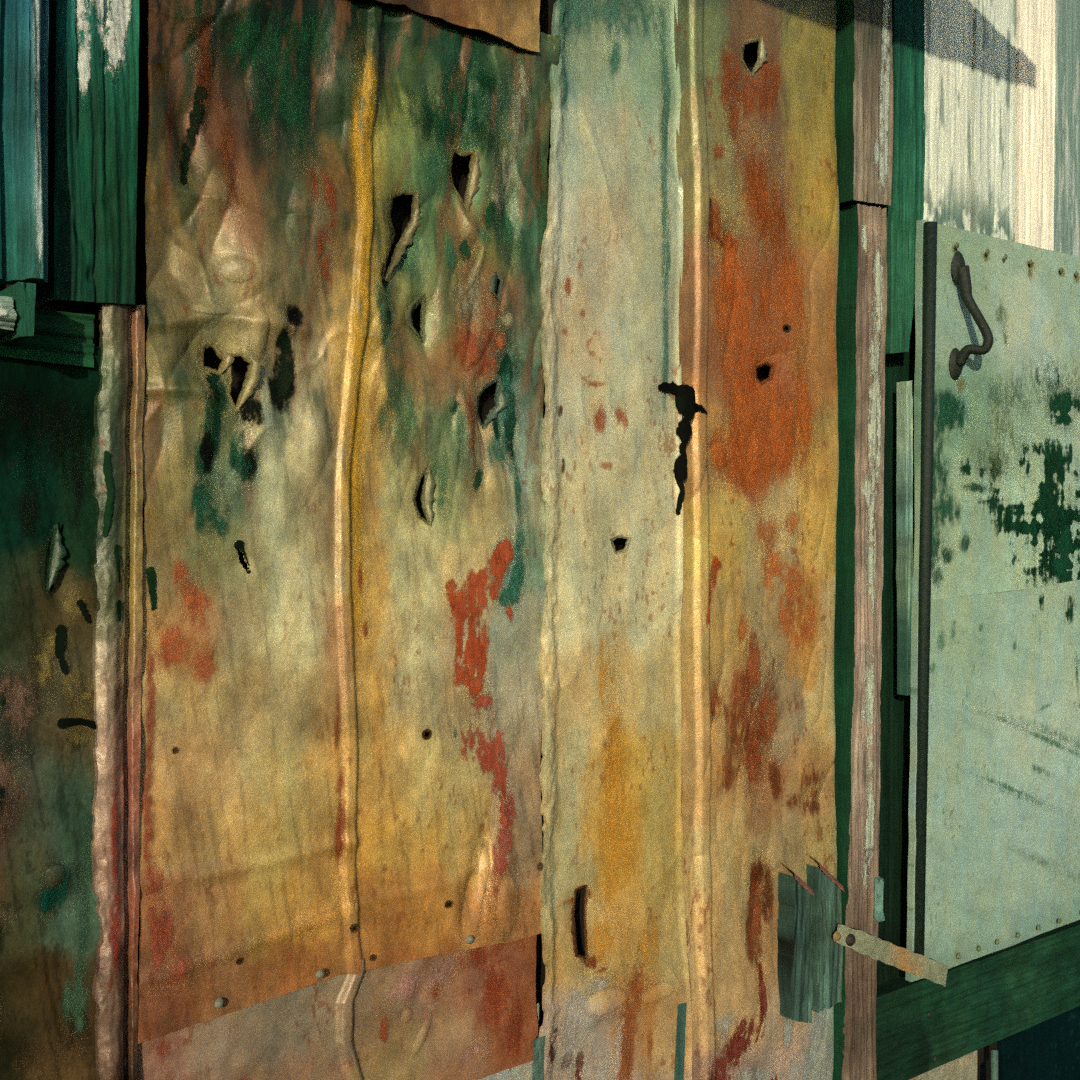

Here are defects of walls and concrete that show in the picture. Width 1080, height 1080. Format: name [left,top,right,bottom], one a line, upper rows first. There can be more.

peeling [76,0,132,91]
spalling [473,470,483,490]
spalling [492,353,516,460]
crack [658,381,708,515]
rust [709,153,812,492]
peeling [931,391,969,582]
peeling [960,368,1080,583]
rust [446,538,514,714]
rust [758,513,815,647]
rust [711,617,820,814]
rust [461,725,516,897]
rust [709,859,774,1080]